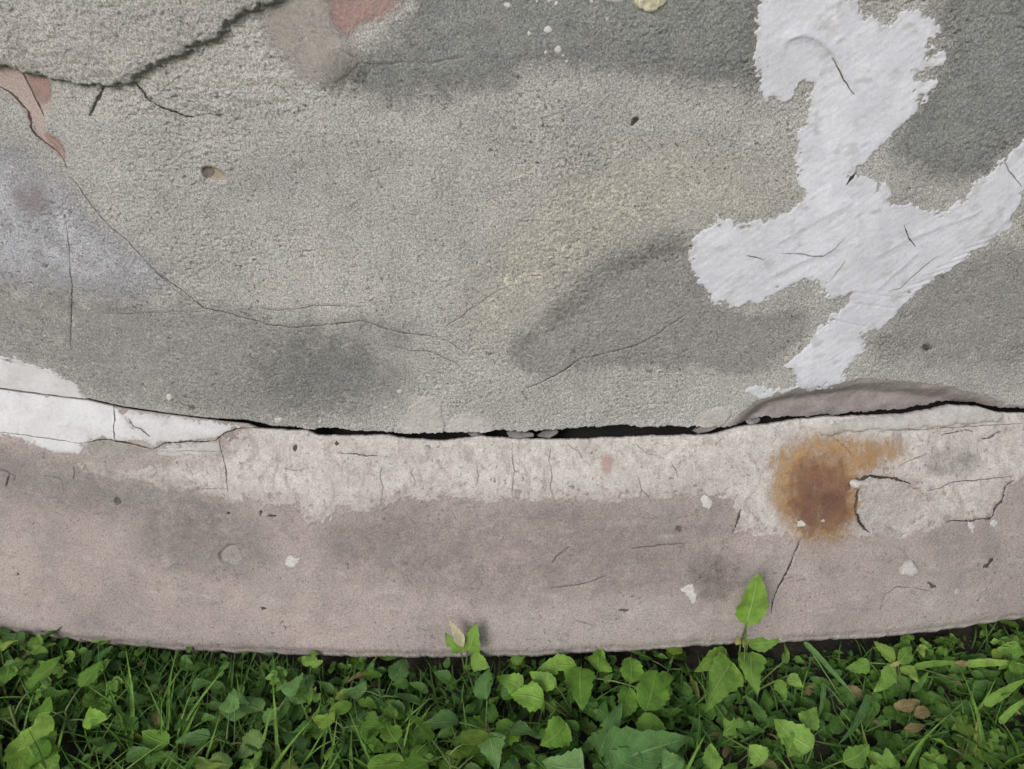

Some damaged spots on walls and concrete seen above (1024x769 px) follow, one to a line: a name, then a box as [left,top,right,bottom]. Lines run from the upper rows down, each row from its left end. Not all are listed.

crack [89,86,106,116]
crack [134,82,219,118]
flaking render [0,0,398,168]
crack [65,222,73,347]
crack [68,176,506,365]
peeling [0,355,1024,542]
crack [1,388,1024,502]
rust [775,440,890,539]
crack [927,476,1015,522]
crack [771,537,802,613]